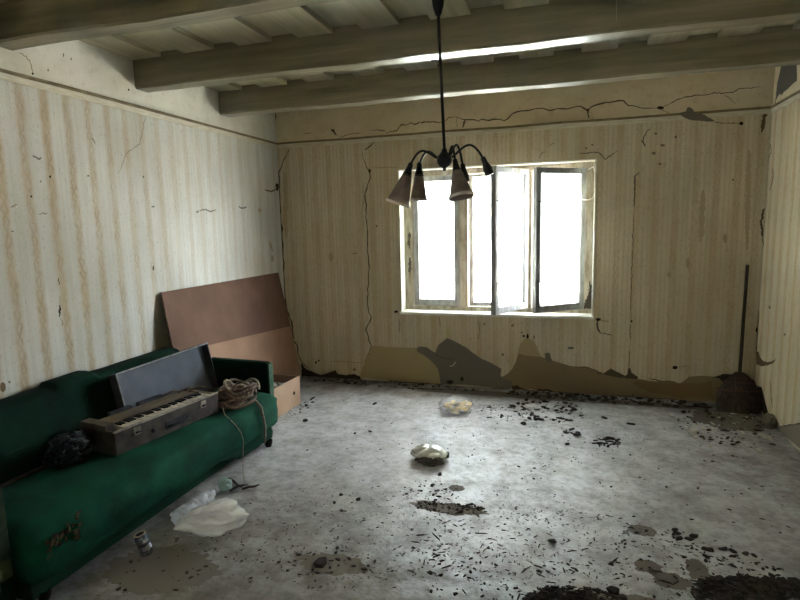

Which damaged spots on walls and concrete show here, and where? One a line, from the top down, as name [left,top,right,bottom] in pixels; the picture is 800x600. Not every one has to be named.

flaking render [776,65,797,99]
crack [278,149,308,368]
crack [331,87,757,369]
flaking render [360,338,732,402]